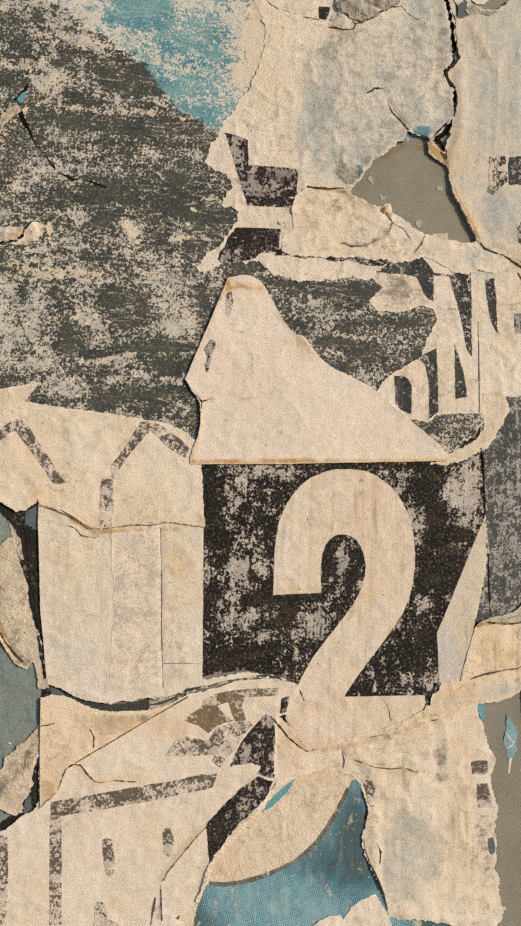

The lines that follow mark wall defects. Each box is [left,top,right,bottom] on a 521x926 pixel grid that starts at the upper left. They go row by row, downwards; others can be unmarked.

peeling [457,0,499,18]
crack [433,0,458,160]
crack [14,83,108,188]
peeling [427,137,449,167]
peeling [503,715,518,774]